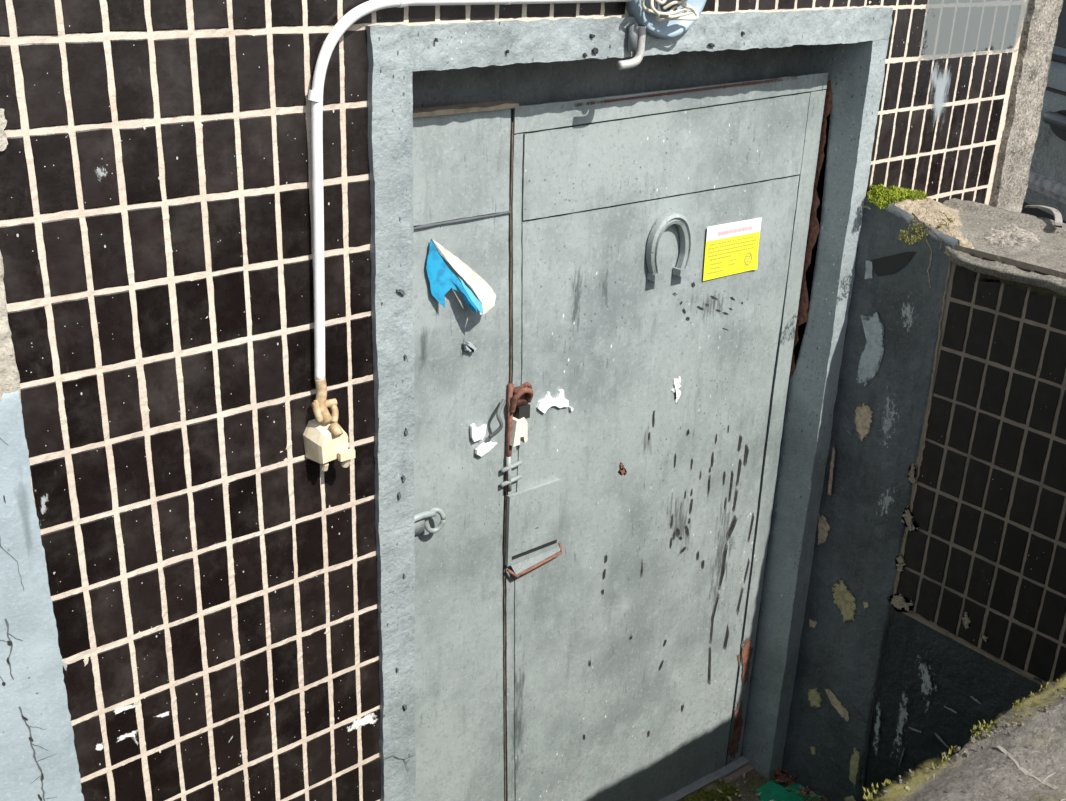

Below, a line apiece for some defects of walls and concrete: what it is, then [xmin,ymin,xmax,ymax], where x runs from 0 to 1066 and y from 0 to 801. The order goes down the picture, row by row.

rust [789,79,832,378]
peeling [856,312,884,387]
spalling [854,402,873,442]
peeling [827,442,836,496]
spalling [818,513,831,546]
spalling [832,578,869,623]
spalling [887,593,914,612]
crack [0,618,23,682]
rust [728,638,753,762]
spalling [808,687,850,722]
crack [19,706,57,801]
spalling [843,747,860,801]